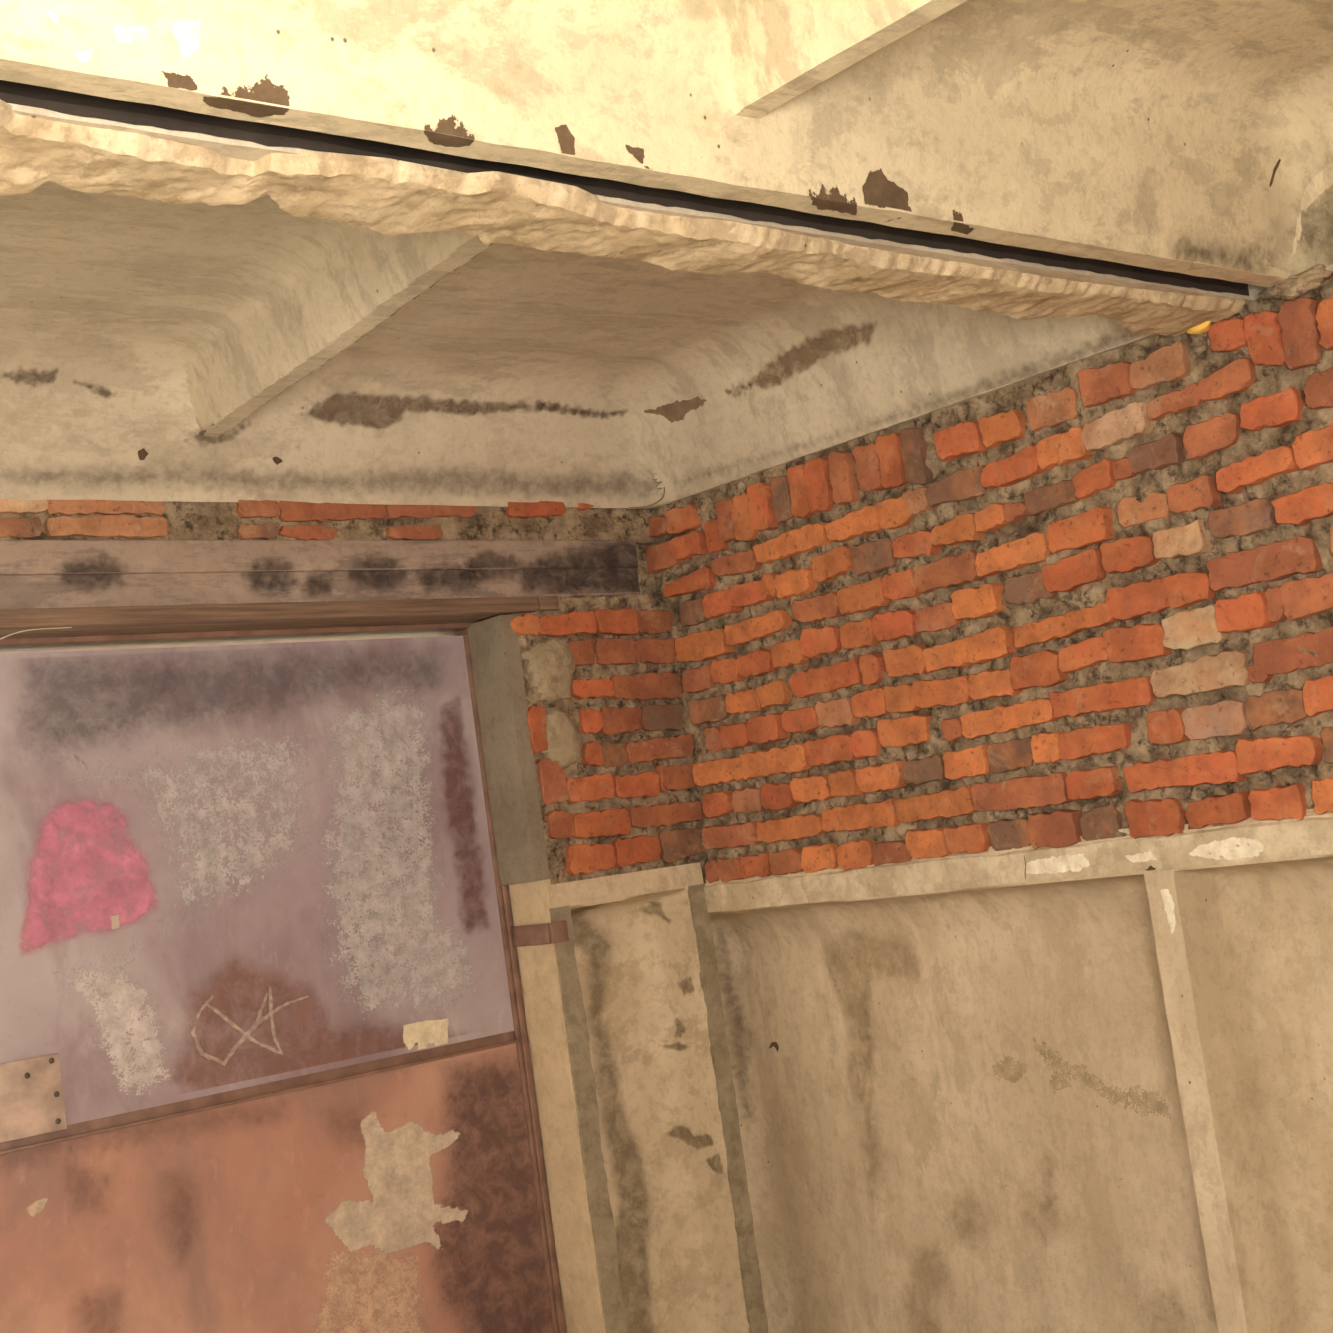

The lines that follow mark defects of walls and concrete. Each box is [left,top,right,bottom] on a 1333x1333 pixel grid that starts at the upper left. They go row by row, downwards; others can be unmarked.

peeling [113,24,151,44]
peeling [170,19,202,57]
spalling [161,71,290,117]
spalling [424,114,475,147]
spalling [555,124,575,155]
spalling [625,145,653,170]
spalling [809,169,912,222]
spalling [951,209,974,235]
water stain [726,325,873,394]
water stain [310,393,626,428]
peeling [1125,850,1157,863]